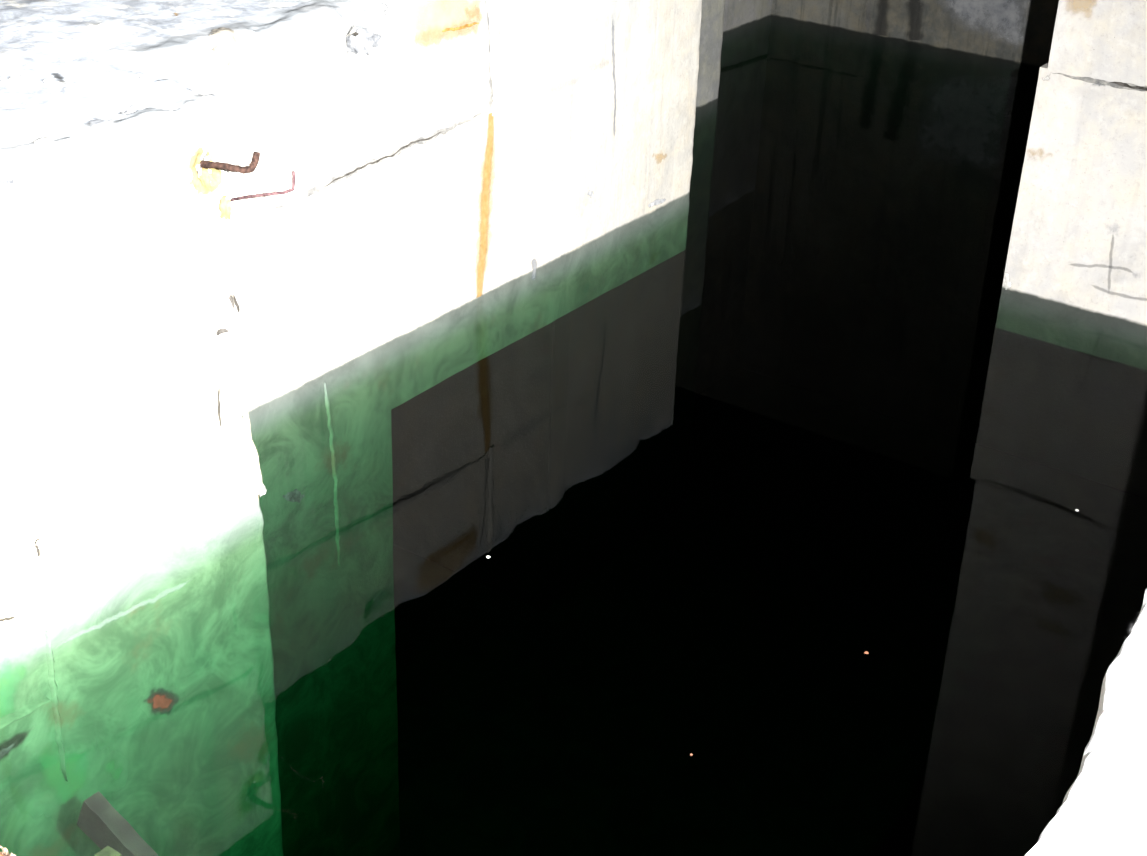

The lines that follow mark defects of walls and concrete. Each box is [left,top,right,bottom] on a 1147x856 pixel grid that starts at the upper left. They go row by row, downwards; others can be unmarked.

corrosion [413,0,481,45]
crack [1052,73,1147,91]
corrosion [185,143,233,222]
crack [234,111,488,234]
corrosion [477,113,494,298]
corrosion [145,689,178,714]
crack [0,733,27,759]